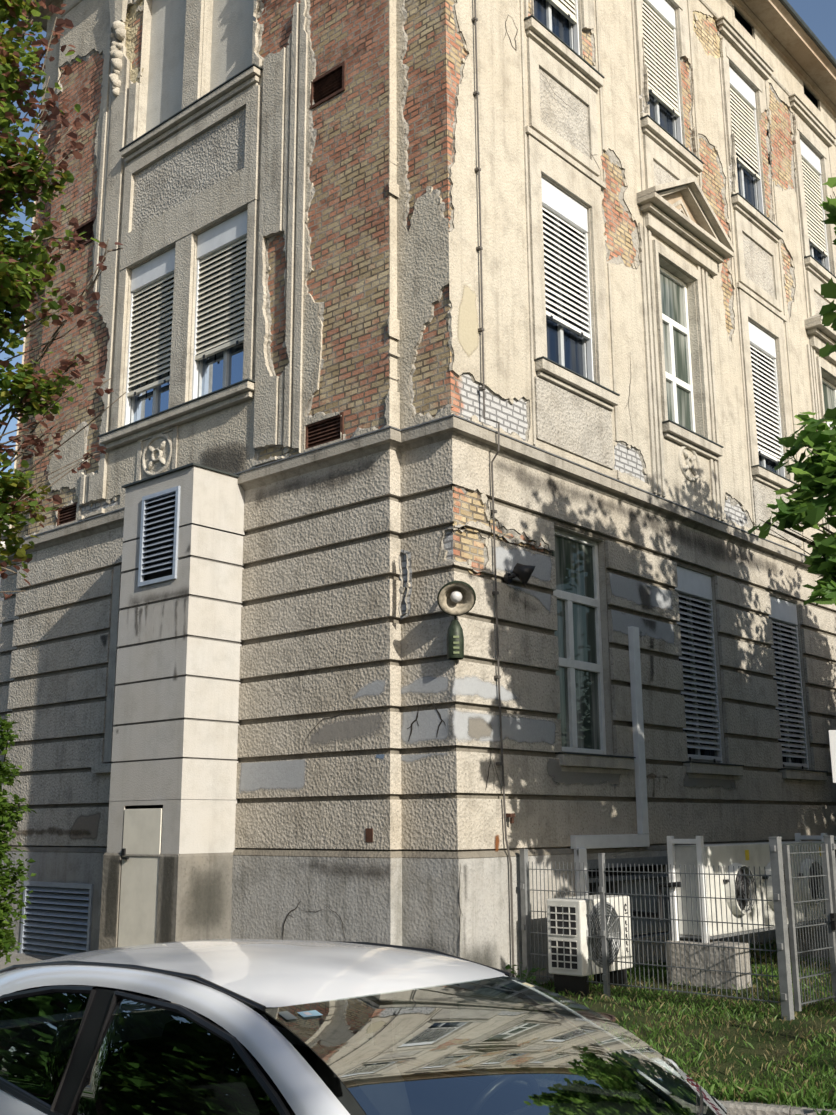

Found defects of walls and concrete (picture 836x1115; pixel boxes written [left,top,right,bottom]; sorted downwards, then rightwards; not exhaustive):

flaking render [257,0,469,440]
flaking render [600,148,640,270]
flaking render [680,57,734,239]
flaking render [759,83,796,219]
flaking render [12,48,120,538]
flaking render [721,258,735,341]
flaking render [409,285,531,442]
flaking render [614,441,648,484]
flaking render [438,485,550,576]
leakage [161,858,174,942]
crack [282,901,345,940]
leakage [474,954,492,966]